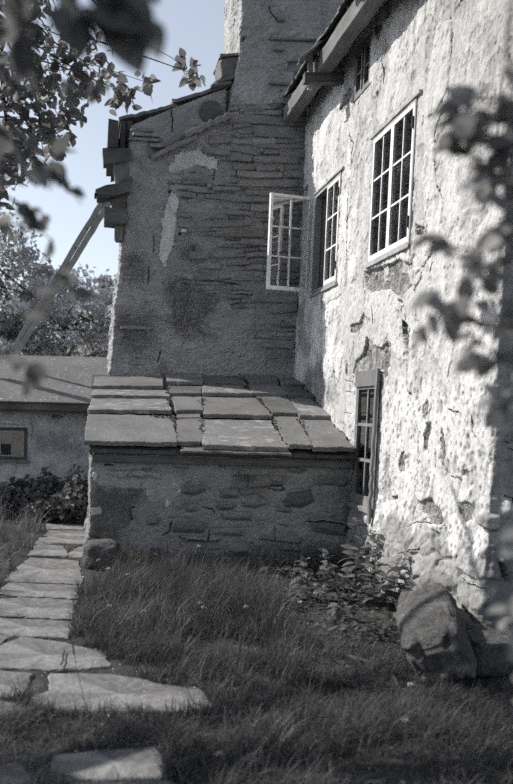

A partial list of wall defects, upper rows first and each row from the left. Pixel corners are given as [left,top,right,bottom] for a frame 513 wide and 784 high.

crack [442,0,466,86]
crack [434,116,443,223]
spalling [363,253,424,301]
spalling [346,314,391,377]
spalling [416,499,446,530]
spalling [457,497,475,524]